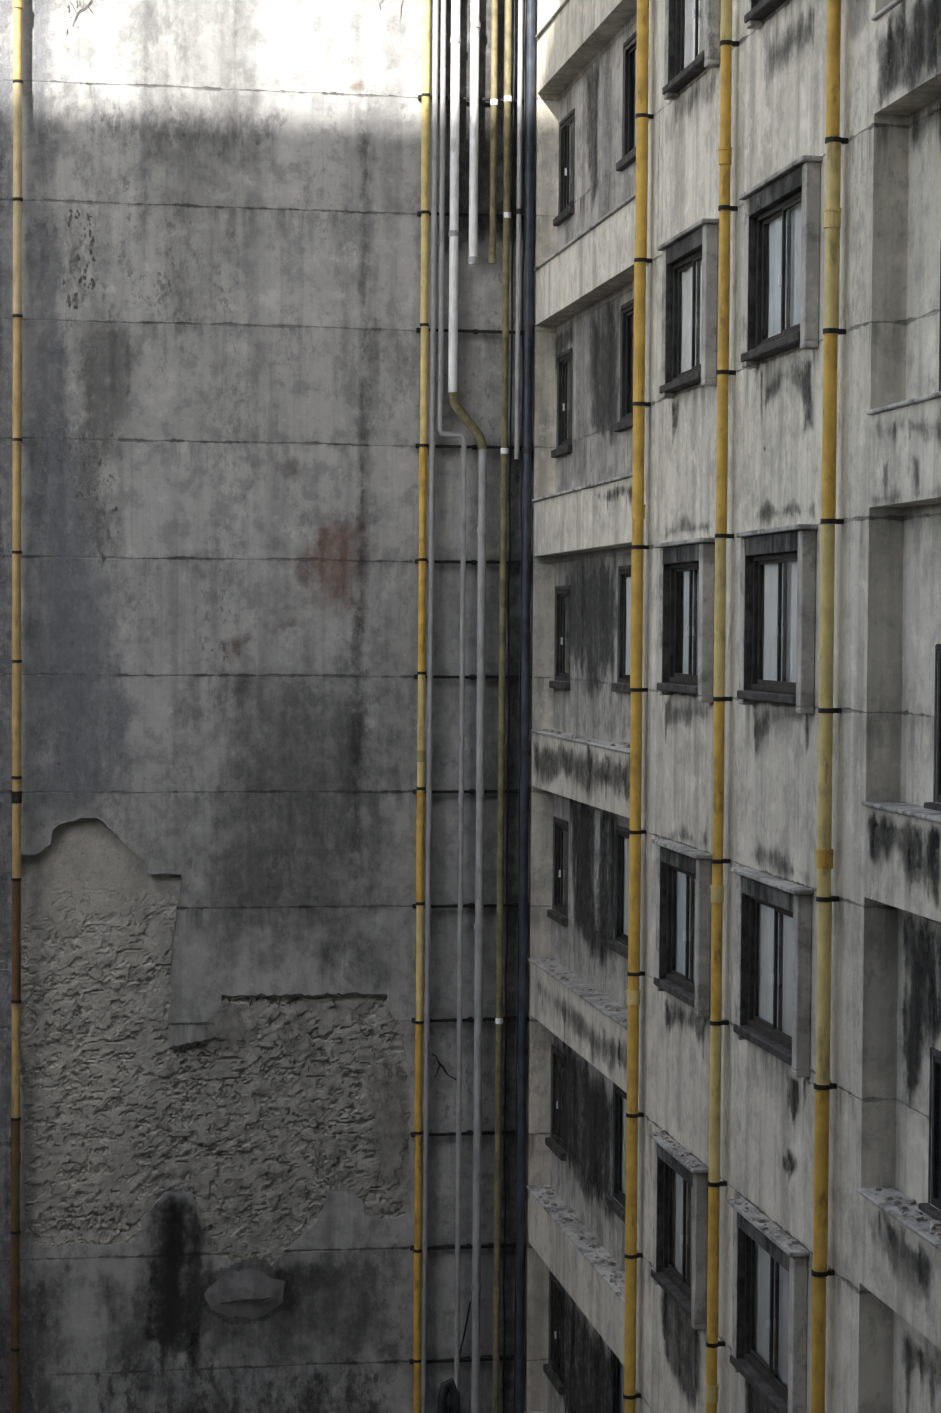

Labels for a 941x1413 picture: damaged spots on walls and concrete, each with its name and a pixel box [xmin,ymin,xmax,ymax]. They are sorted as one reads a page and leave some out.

water stain [878,0,941,104]
flaking render [0,814,411,1265]
water stain [501,441,630,1413]
water stain [869,813,939,905]
water stain [903,917,941,1102]
water stain [123,1197,376,1375]